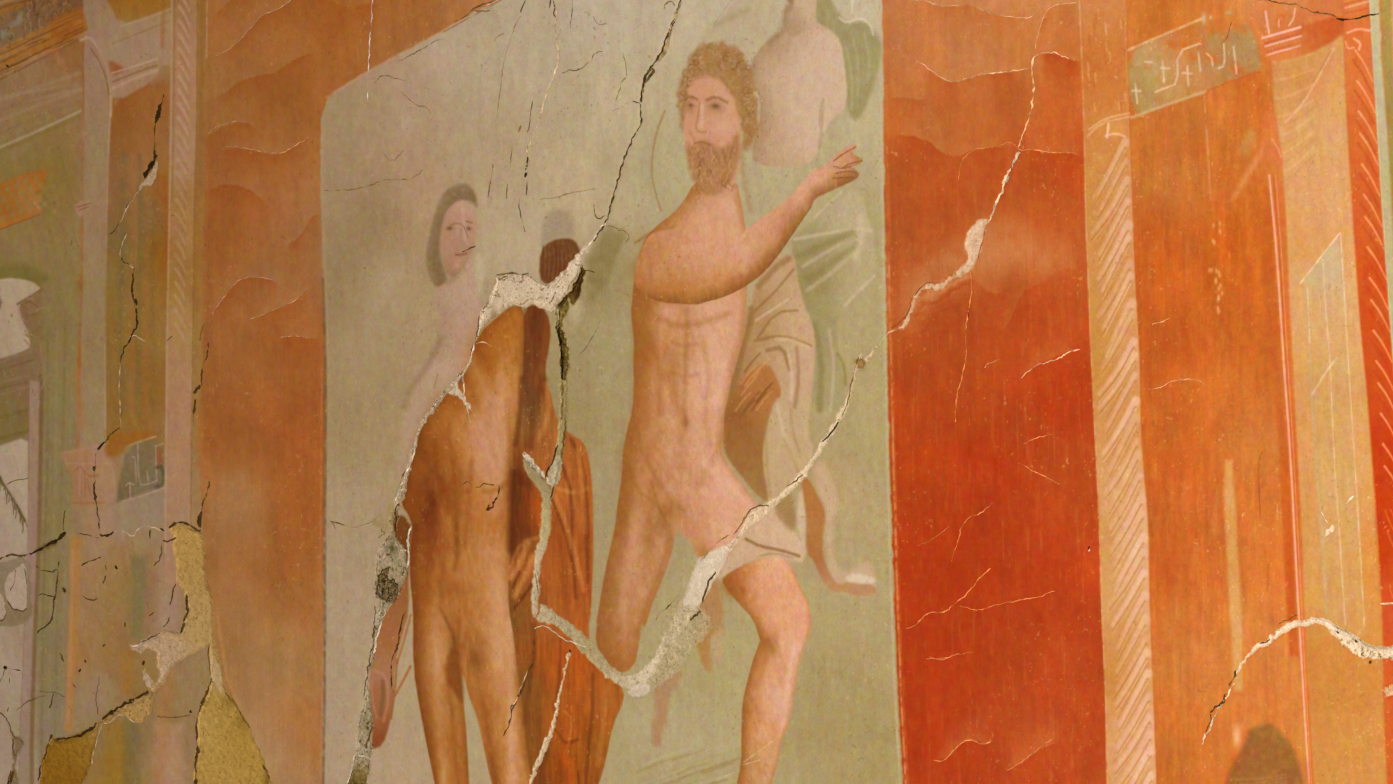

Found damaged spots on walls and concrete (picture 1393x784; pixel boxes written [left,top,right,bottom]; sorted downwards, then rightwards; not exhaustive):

crack [374,40,437,114]
crack [488,0,681,245]
crack [853,0,1080,422]
crack [1268,0,1379,21]
crack [0,94,311,714]
peeling [37,520,272,784]
crack [330,317,481,784]
crack [1202,670,1236,745]